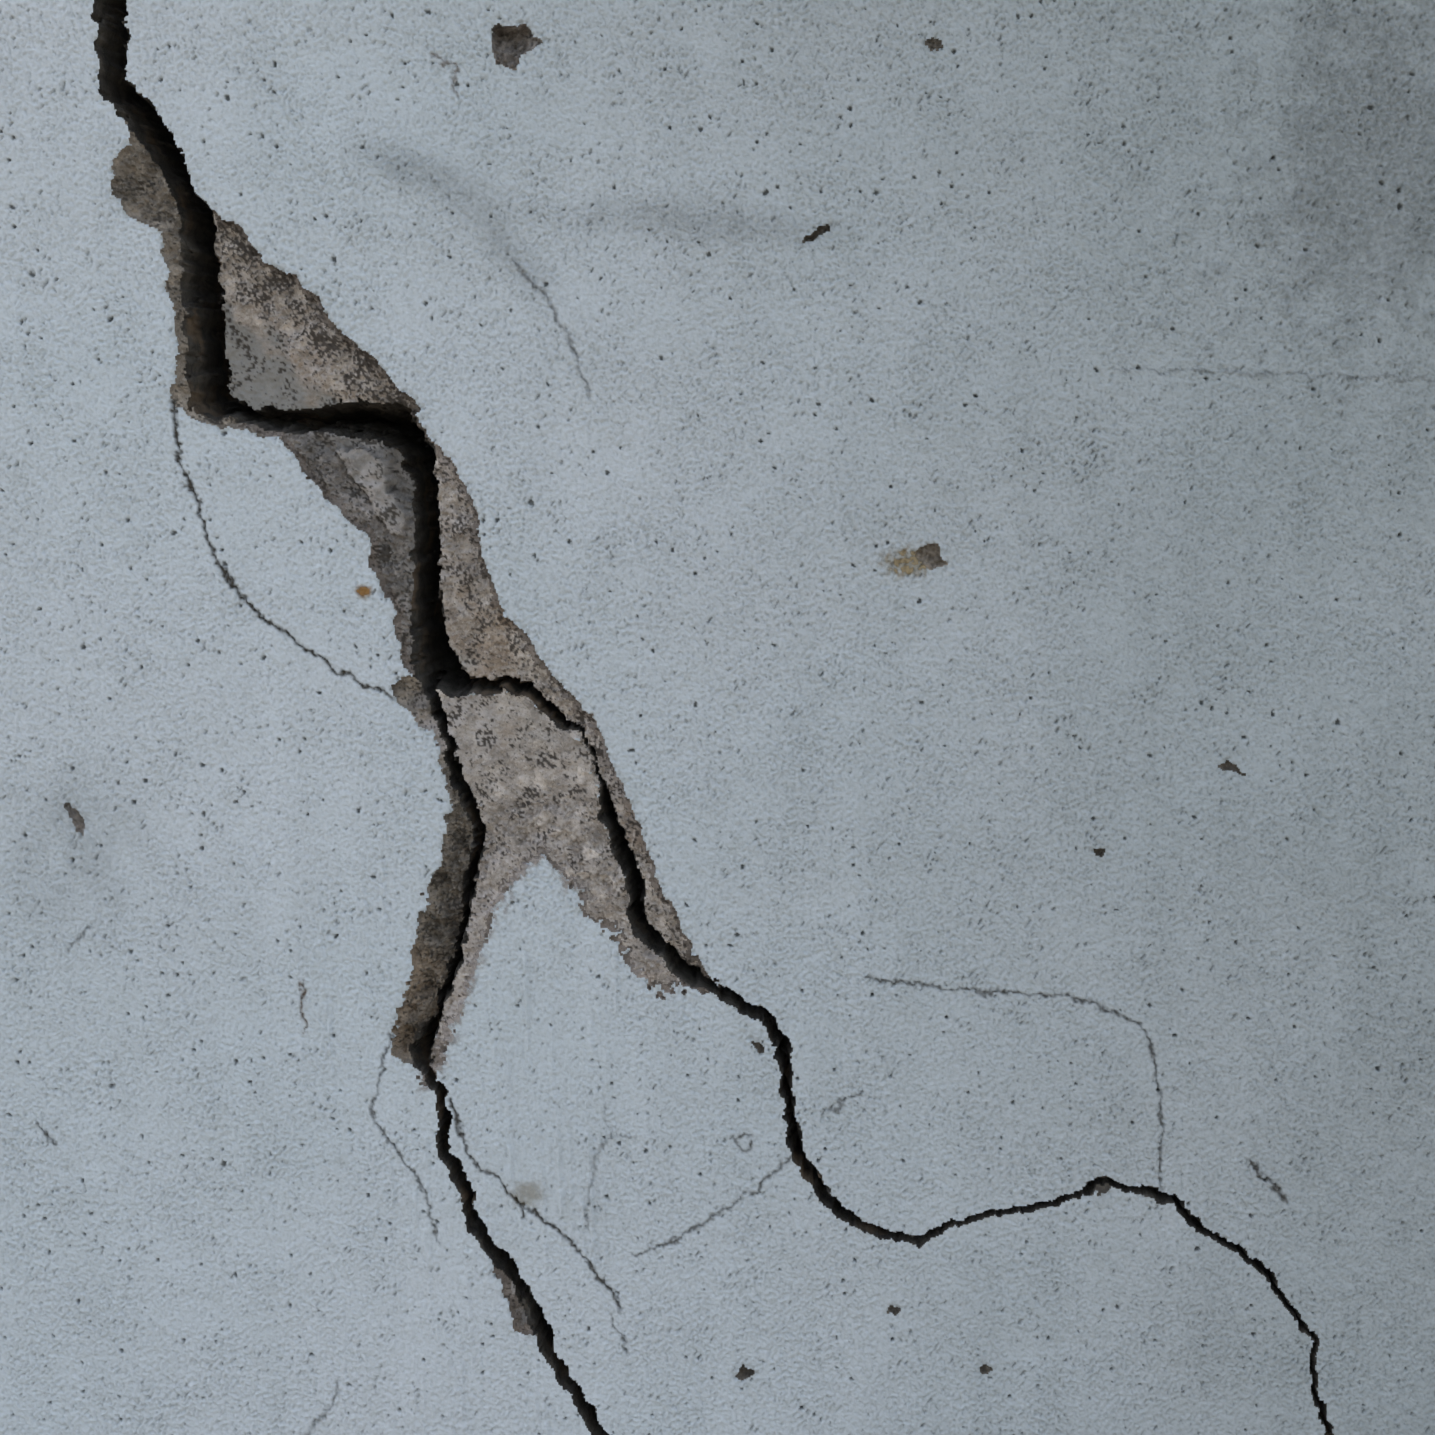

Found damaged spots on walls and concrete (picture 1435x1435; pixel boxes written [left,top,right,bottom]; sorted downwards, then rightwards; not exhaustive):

crack [90,0,620,1435]
flaking render [111,121,722,1087]
crack [458,674,1334,1435]